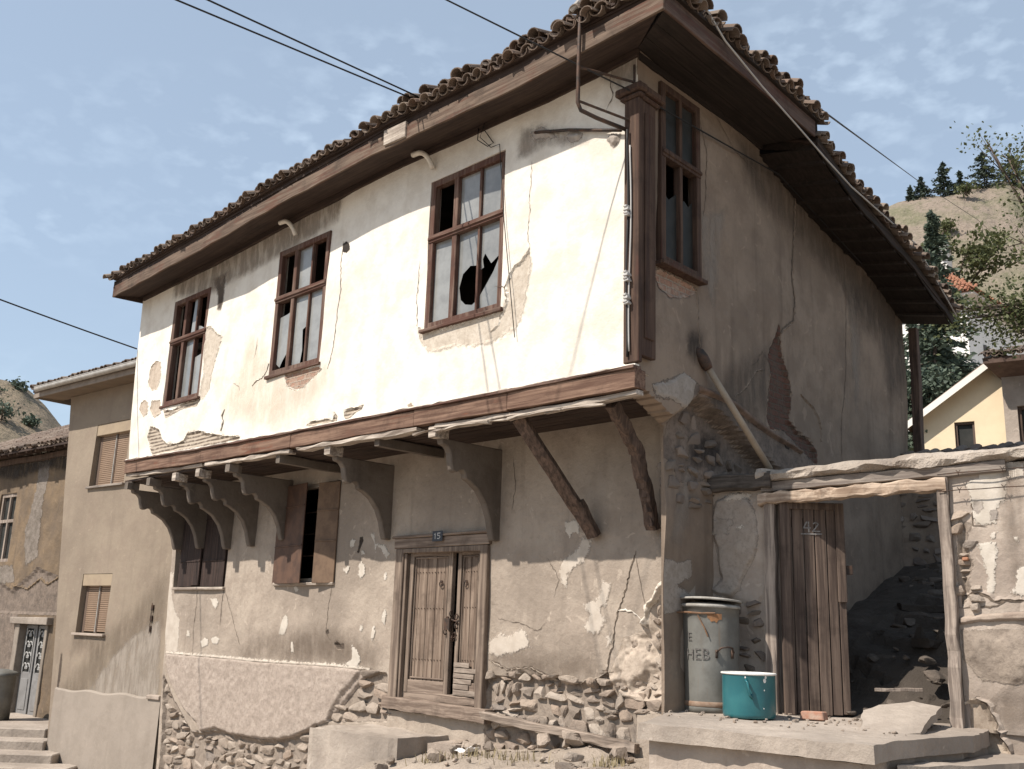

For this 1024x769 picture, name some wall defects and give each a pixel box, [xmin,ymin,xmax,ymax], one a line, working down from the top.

crack [327,241,344,369]
flaking render [418,252,532,352]
crack [490,163,532,332]
crack [781,198,796,334]
flaking render [139,325,240,455]
flaking render [284,367,322,391]
flaking render [652,325,817,509]
flaking render [0,460,58,616]
crack [489,552,645,686]
peeling [559,520,593,588]
spalling [483,558,692,756]
peeling [950,462,1024,611]